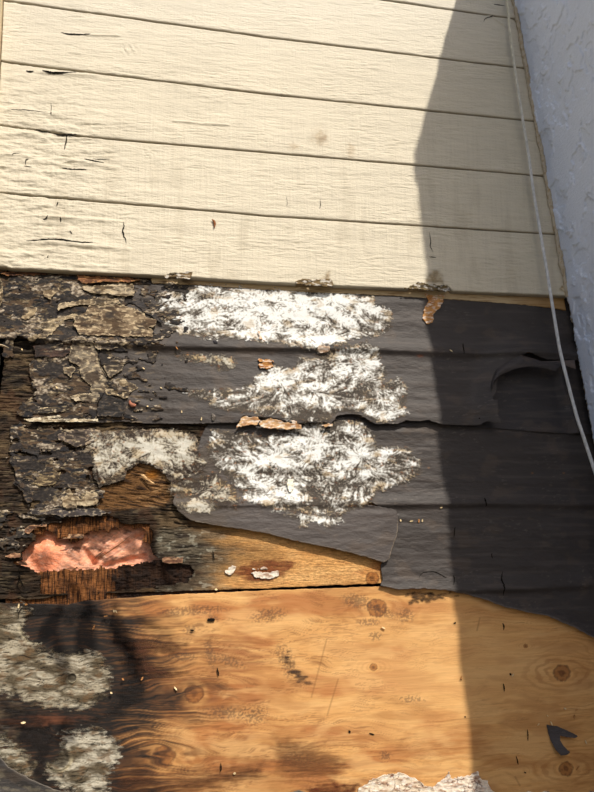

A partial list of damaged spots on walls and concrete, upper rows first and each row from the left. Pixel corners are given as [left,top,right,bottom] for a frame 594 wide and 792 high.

peeling [0,270,48,305]
spalling [295,278,334,287]
peeling [21,306,37,320]
peeling [24,275,199,453]
leakage [72,284,421,528]
peeling [13,460,196,518]
peeling [252,567,279,579]
leakage [17,605,183,719]
leakage [172,769,258,788]
peeling [358,771,494,792]